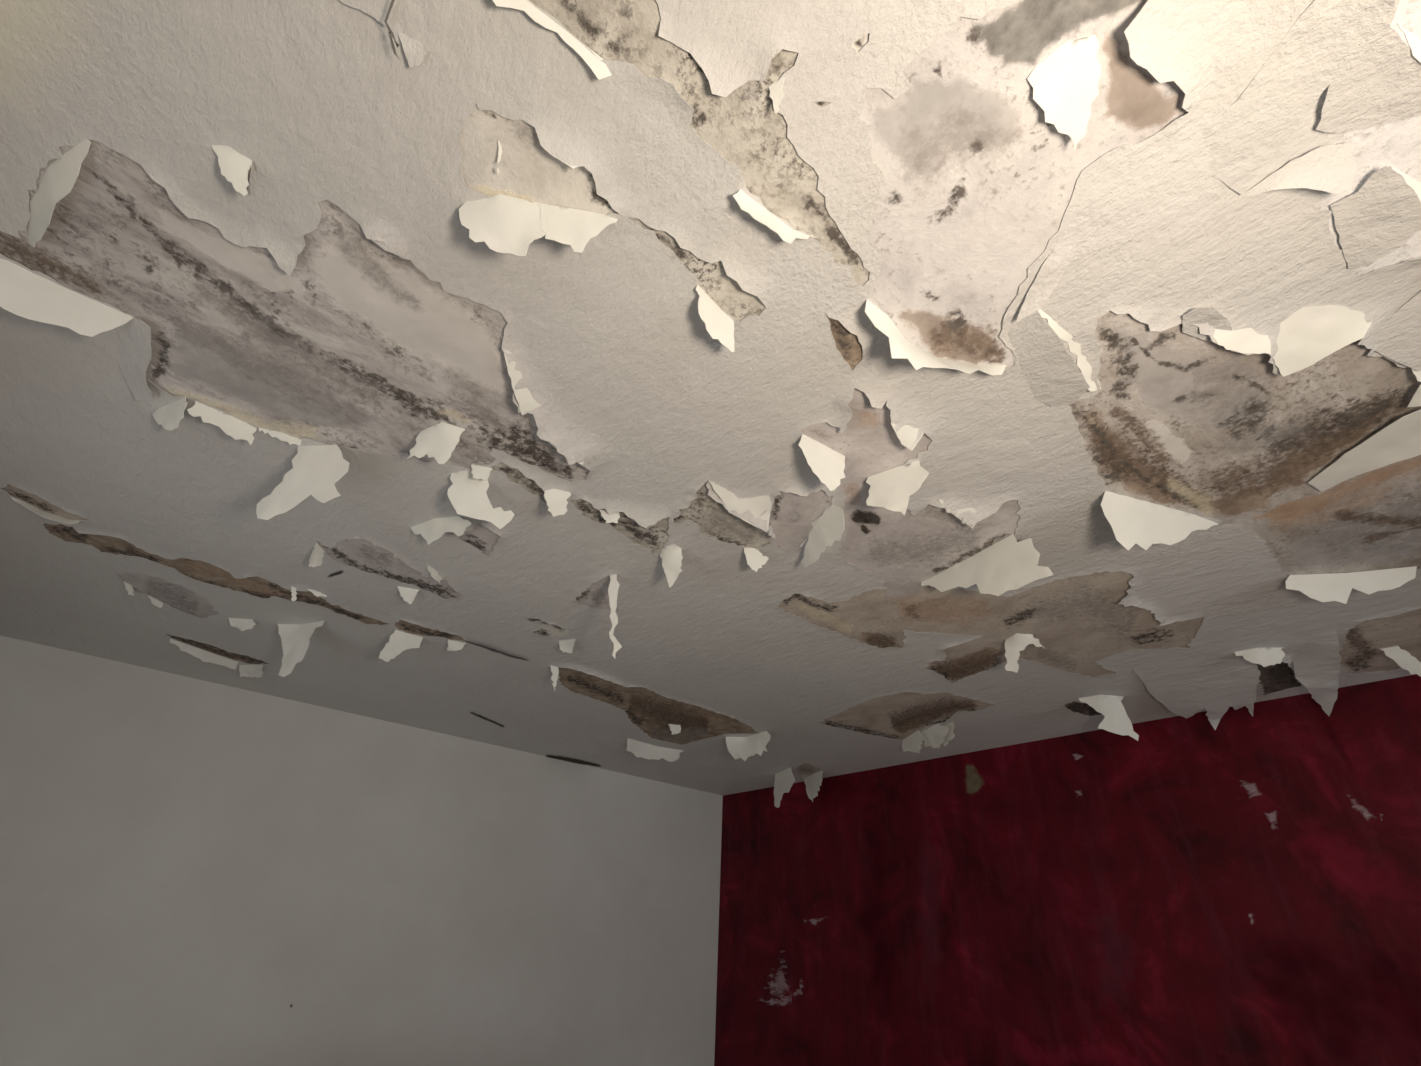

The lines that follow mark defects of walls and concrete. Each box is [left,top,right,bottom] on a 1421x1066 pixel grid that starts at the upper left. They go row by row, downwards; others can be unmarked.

peeling [492,0,1189,376]
peeling [1202,0,1421,275]
peeling [0,104,1421,762]
peeling [774,763,823,808]